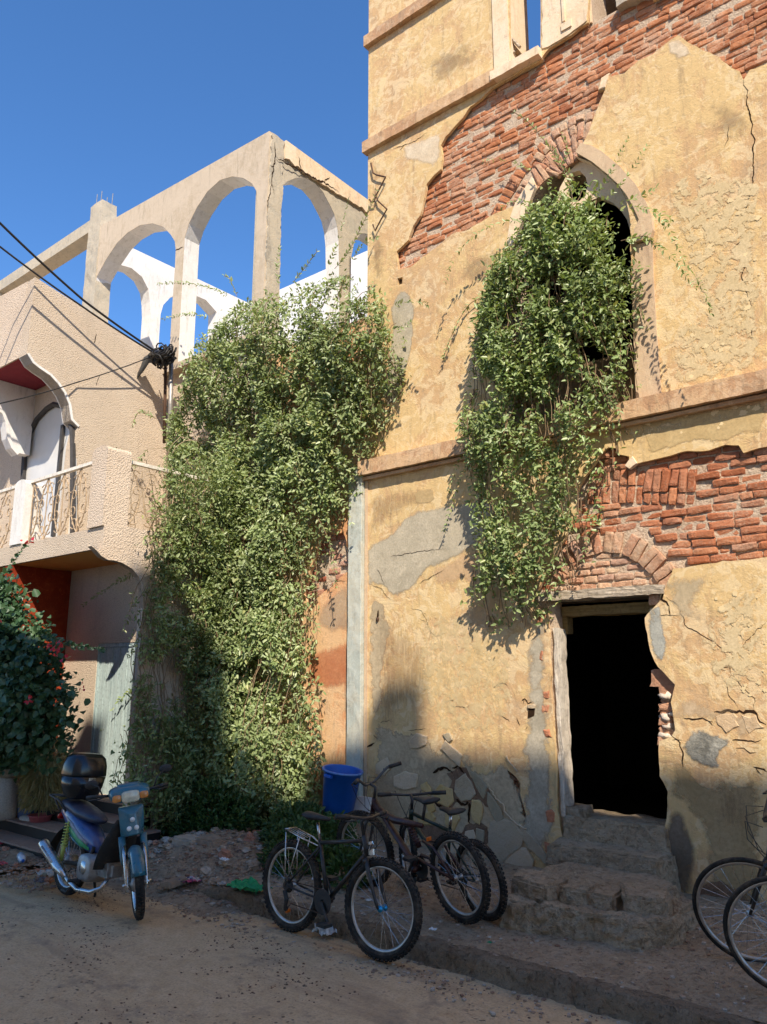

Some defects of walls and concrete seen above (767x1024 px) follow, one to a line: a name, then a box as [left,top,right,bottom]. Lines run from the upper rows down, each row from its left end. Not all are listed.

crack [267,149,336,213]
flaking render [399,0,767,269]
crack [724,83,756,335]
flaking render [541,446,767,616]
spalling [650,669,764,745]
crack [660,594,767,775]
flaking render [375,725,550,867]